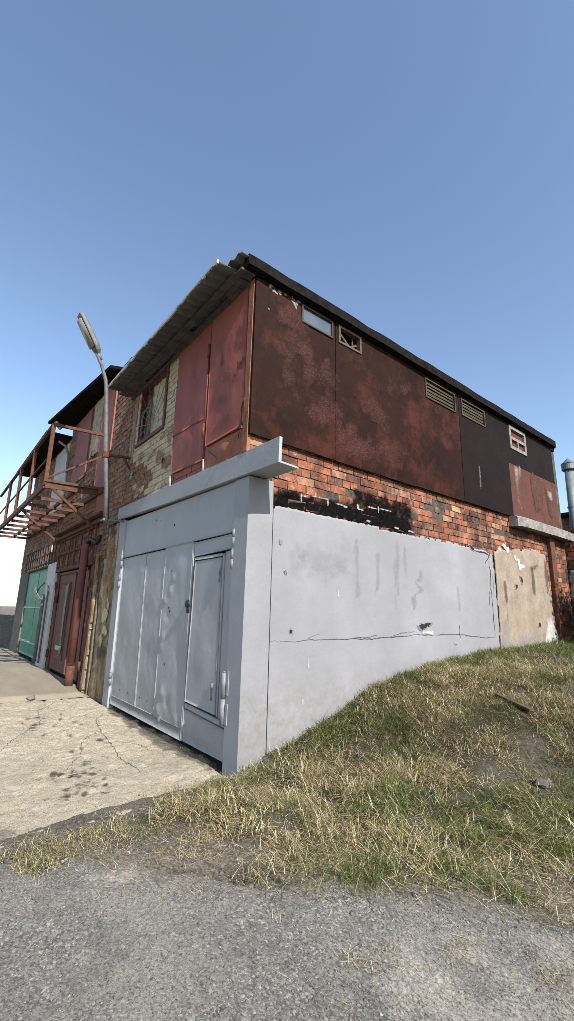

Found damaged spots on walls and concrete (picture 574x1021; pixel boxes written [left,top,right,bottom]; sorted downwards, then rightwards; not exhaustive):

peeling [129,436,170,498]
flaking render [97,524,118,659]
crack [280,550,495,645]
flaking render [498,543,525,590]